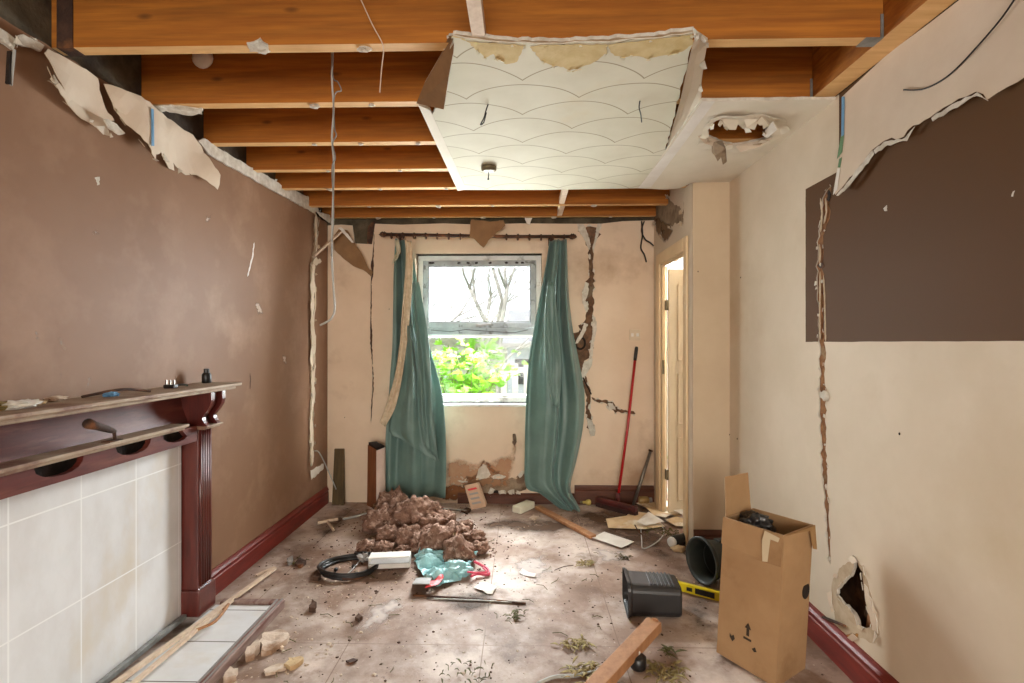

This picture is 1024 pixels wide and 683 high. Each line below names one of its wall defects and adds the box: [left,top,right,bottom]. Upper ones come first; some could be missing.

peeling [744,116,770,145]
flaking render [653,194,684,239]
crack [367,221,377,418]
crack [573,222,635,436]
crack [814,185,831,561]
flaking render [458,470,528,495]
hole [827,555,880,644]